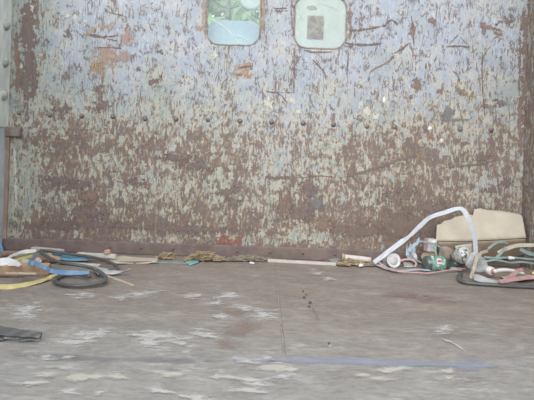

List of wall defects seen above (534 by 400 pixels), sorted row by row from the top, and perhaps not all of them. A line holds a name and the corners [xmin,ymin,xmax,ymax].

peeling [480,13,516,36]
rust [13,0,40,110]
rust [88,24,132,78]
peeling [368,16,416,81]
peeling [51,101,73,113]
peeling [84,84,112,112]
peeling [409,78,425,100]
peeling [481,96,507,108]
rust [518,0,529,156]
rust [37,201,250,234]
rust [330,186,456,242]